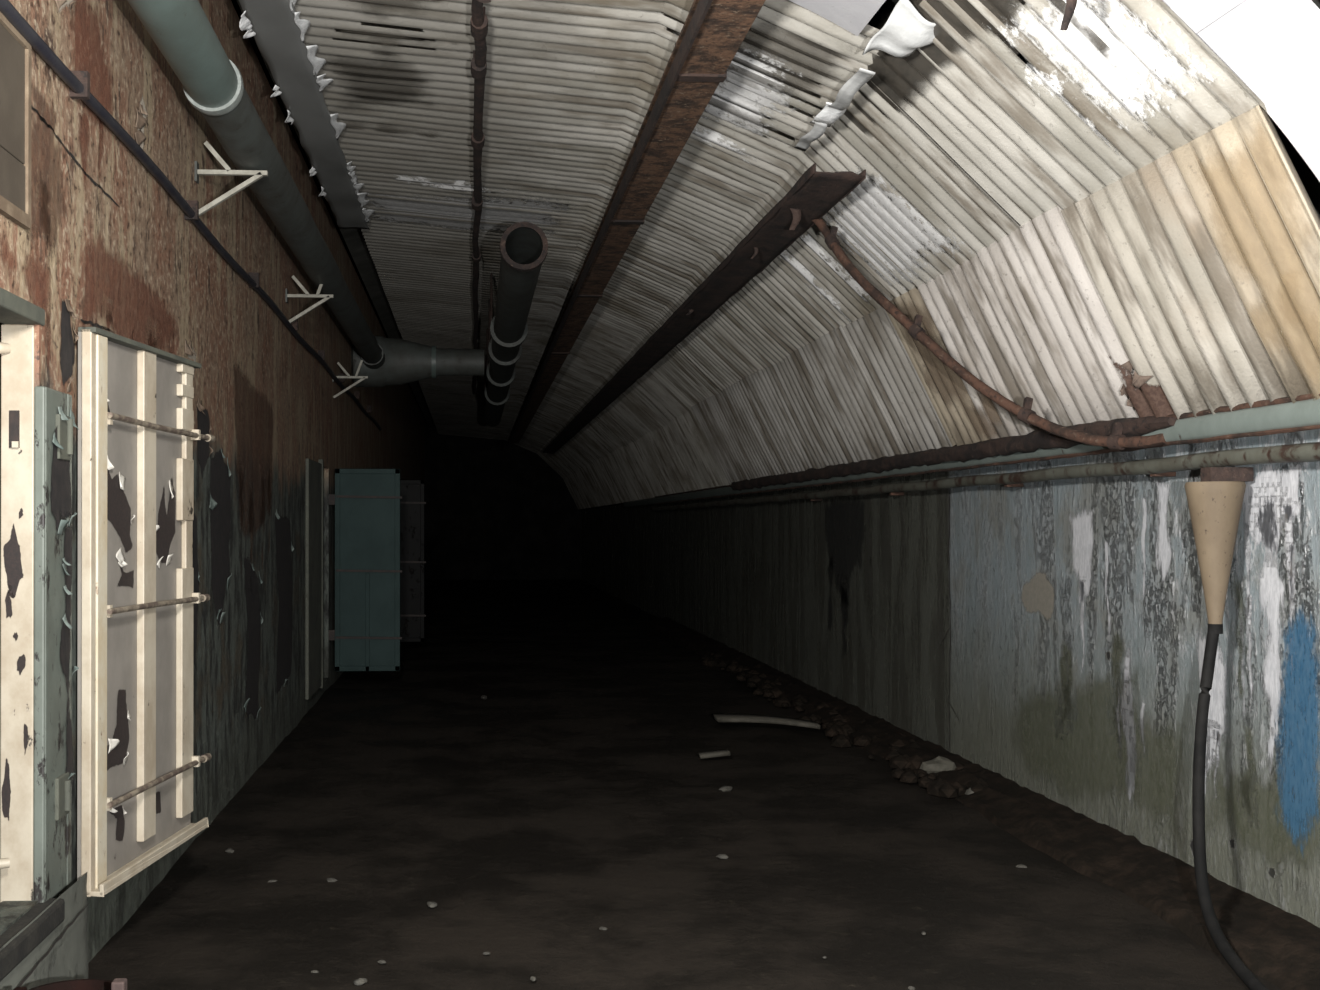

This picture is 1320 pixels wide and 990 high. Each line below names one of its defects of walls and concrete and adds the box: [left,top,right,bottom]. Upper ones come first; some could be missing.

rust [899,305,1001,438]
peeling [3,508,23,640]
peeling [51,299,79,785]
peeling [107,455,135,588]
peeling [156,478,176,569]
peeling [17,654,26,675]
peeling [107,690,131,770]
peeling [2,759,11,820]
peeling [110,805,127,841]